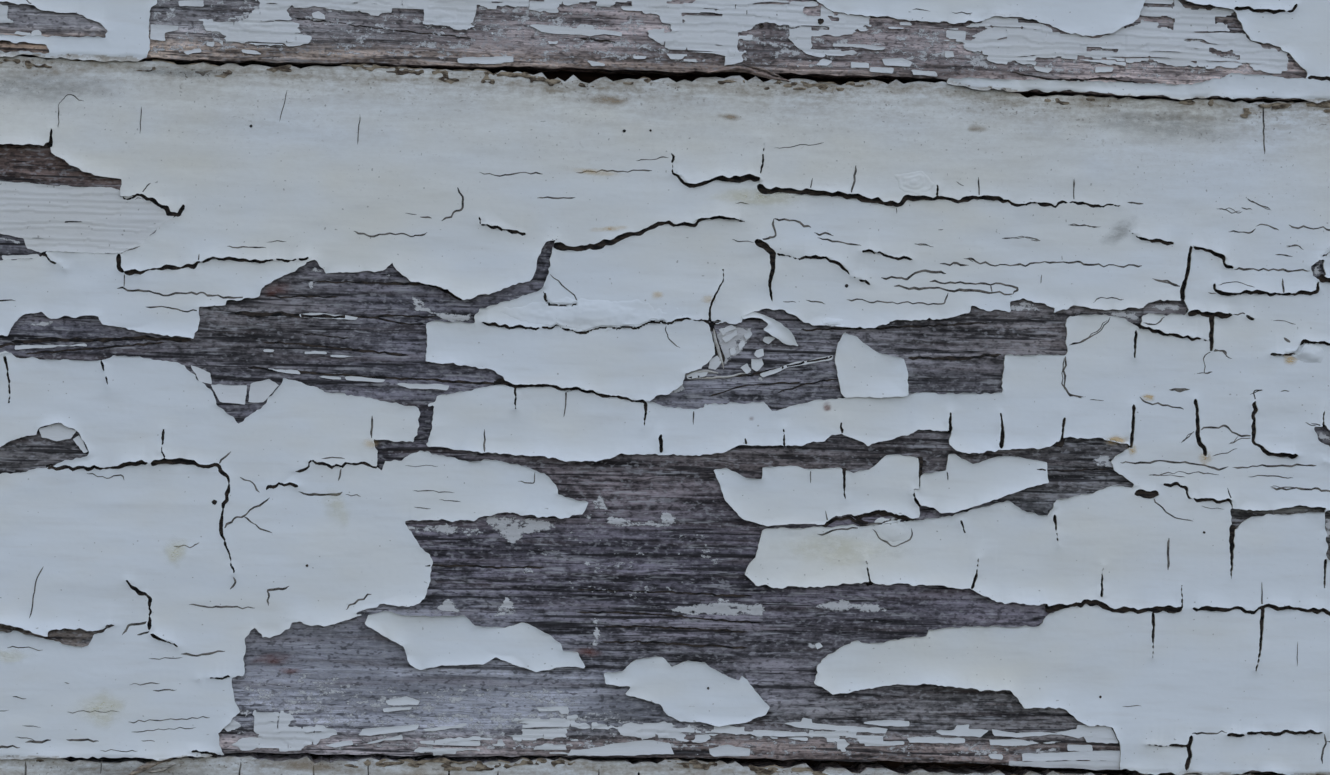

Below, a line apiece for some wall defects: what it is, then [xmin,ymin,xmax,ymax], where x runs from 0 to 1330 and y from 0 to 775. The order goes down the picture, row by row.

peeling [0,1,107,54]
peeling [147,0,1307,85]
peeling [0,143,174,260]
crack [0,143,1330,671]
peeling [0,239,1188,770]
peeling [1230,505,1330,560]
crack [0,580,242,775]
crack [1149,730,1330,770]